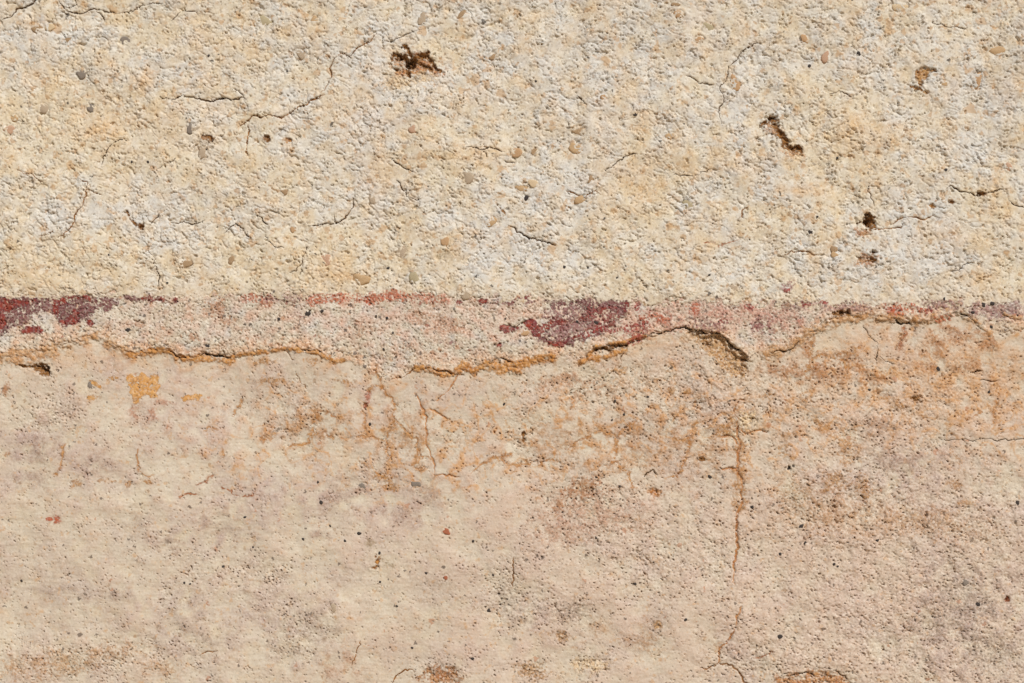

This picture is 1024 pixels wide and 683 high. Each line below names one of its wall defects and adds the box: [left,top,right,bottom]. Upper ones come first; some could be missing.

crack [160,29,422,154]
spalling [386,53,445,89]
crack [686,43,756,123]
spalling [760,117,803,156]
crack [41,139,127,238]
crack [867,186,935,230]
crack [946,185,1024,208]
crack [151,199,354,274]
crack [508,225,555,246]
crack [168,350,229,358]
crack [620,318,909,372]
crack [260,367,773,683]